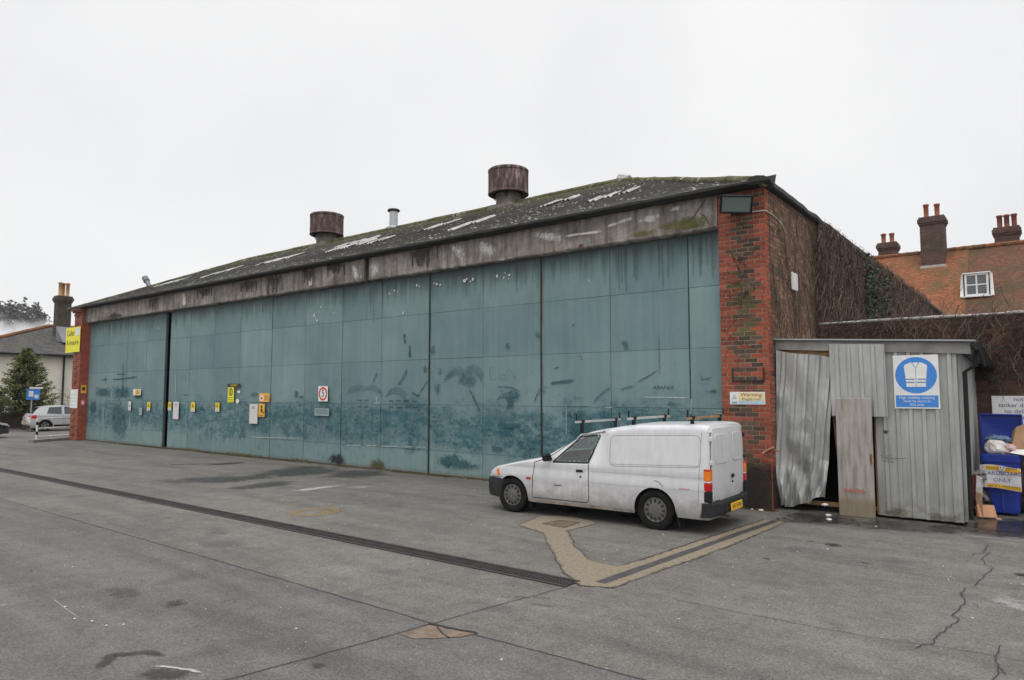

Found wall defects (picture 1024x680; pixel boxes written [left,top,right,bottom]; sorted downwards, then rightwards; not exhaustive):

crack [915,544,993,648]
crack [992,645,1006,680]